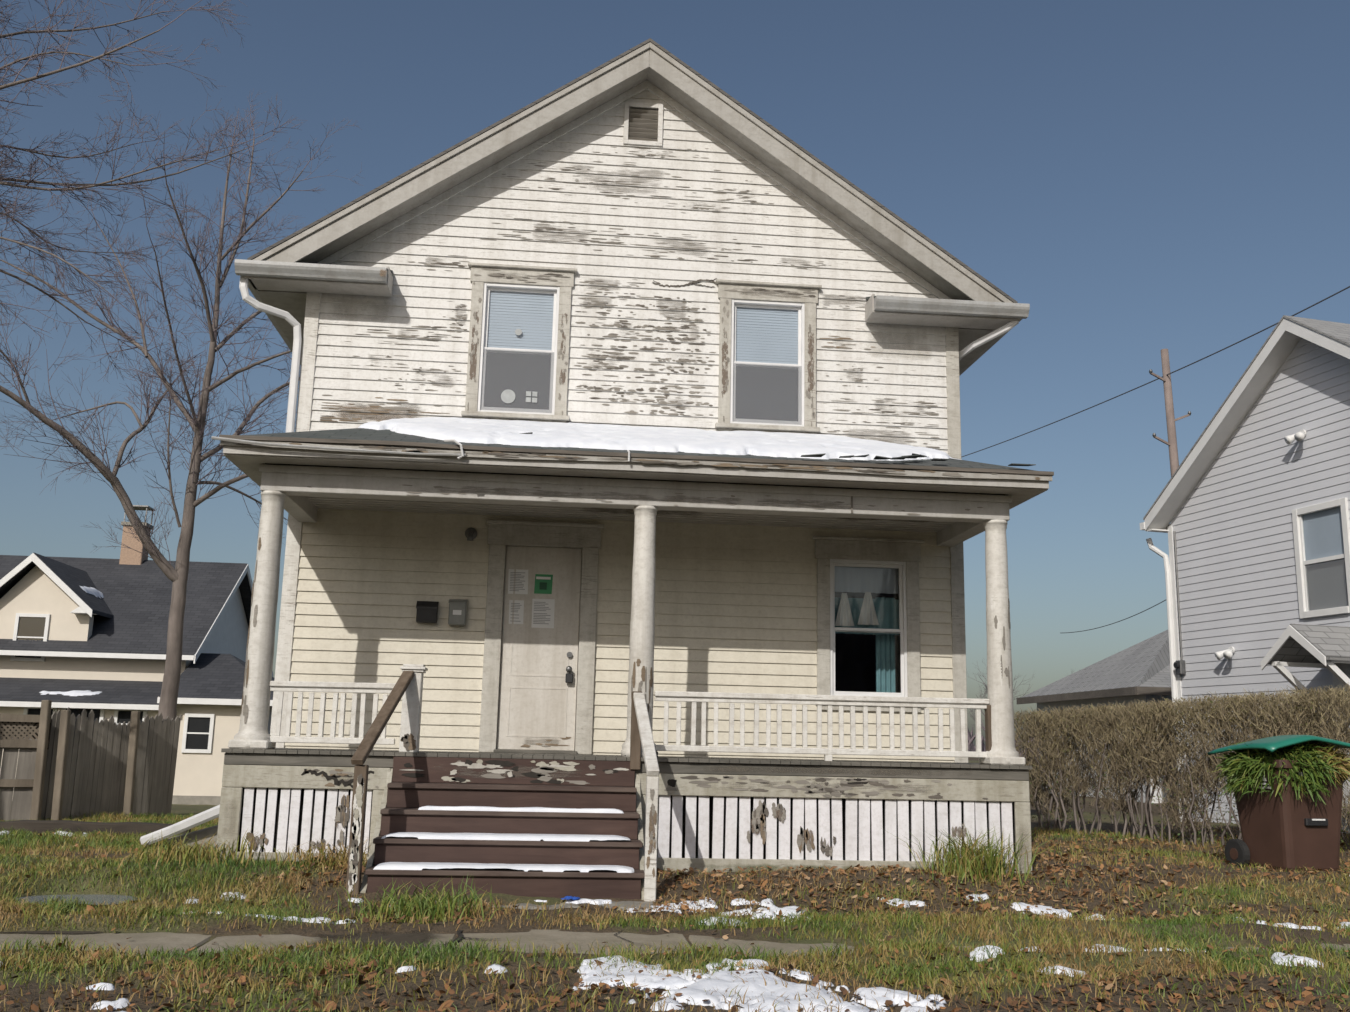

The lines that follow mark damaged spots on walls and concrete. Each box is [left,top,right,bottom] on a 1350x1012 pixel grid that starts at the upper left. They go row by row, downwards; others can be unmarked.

peeling [502,148,774,213]
peeling [484,218,761,261]
peeling [320,255,865,431]
peeling [806,324,939,449]
crack [301,769,374,788]
peeling [401,733,425,778]
peeling [441,737,629,785]
peeling [307,769,379,893]
peeling [646,776,952,878]